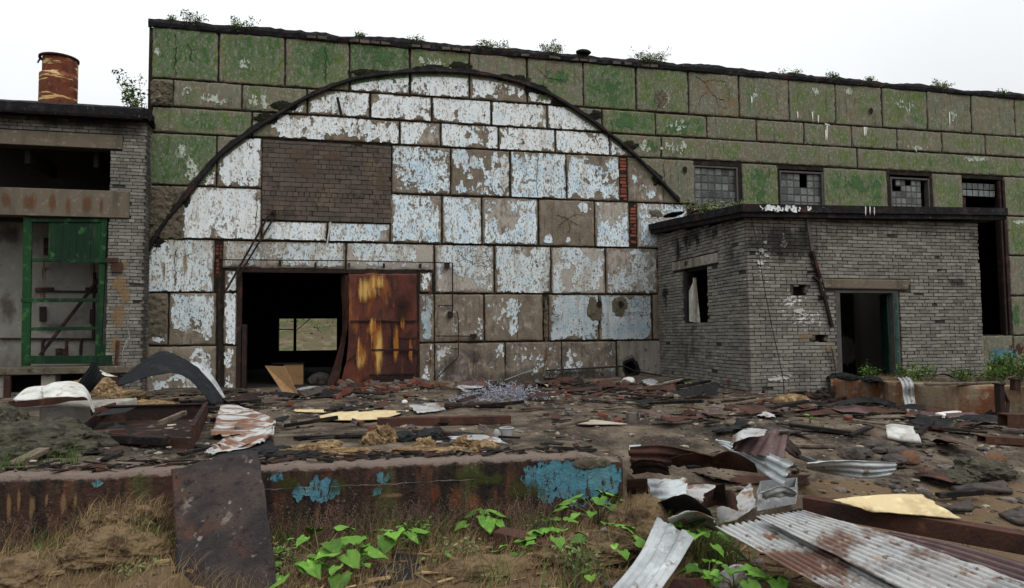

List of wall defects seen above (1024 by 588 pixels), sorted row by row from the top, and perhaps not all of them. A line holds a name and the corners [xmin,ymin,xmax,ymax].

peeling [146,56,690,431]
corrosion [359,274,384,301]
corrosion [357,317,412,371]
corrosion [7,493,47,515]
peeling [520,457,622,509]